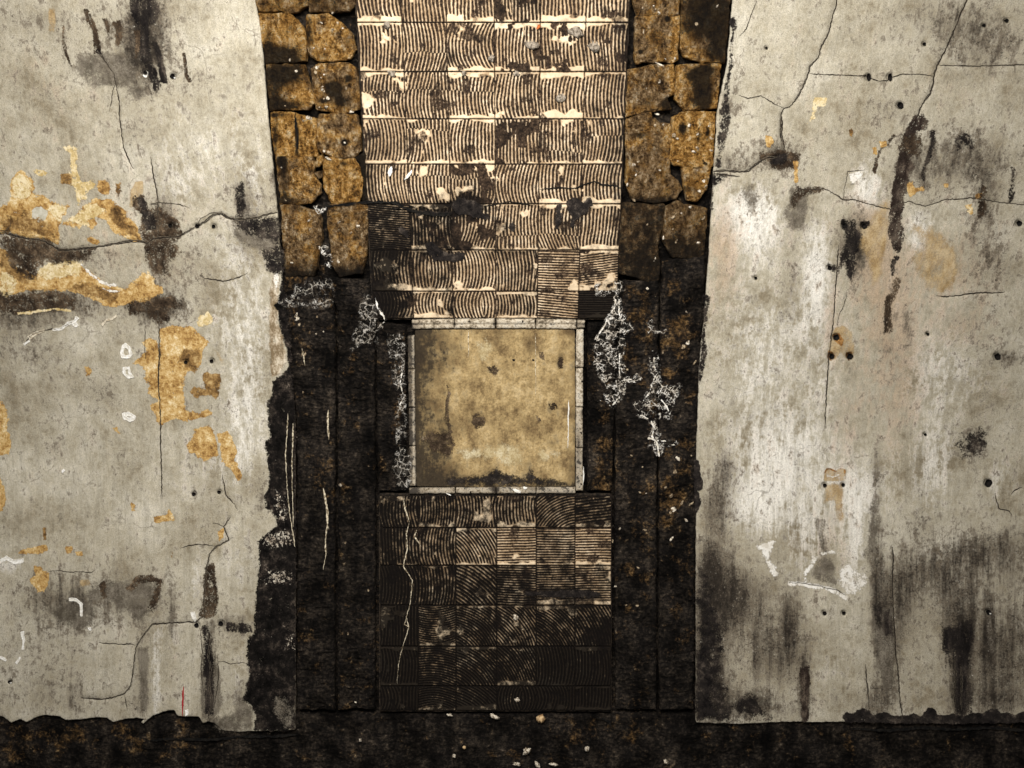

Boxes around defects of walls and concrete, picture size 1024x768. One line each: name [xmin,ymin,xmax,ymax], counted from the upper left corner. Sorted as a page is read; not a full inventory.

peeling [0,145,143,245]
peeling [0,248,164,326]
leakage [62,0,167,98]
crack [0,51,276,251]
crack [144,314,163,494]
peeling [120,311,242,481]
leakage [199,181,331,732]
leakage [594,281,678,456]
crack [712,0,1024,177]
leakage [872,113,936,333]
crack [82,475,246,718]
leakage [842,604,1024,724]